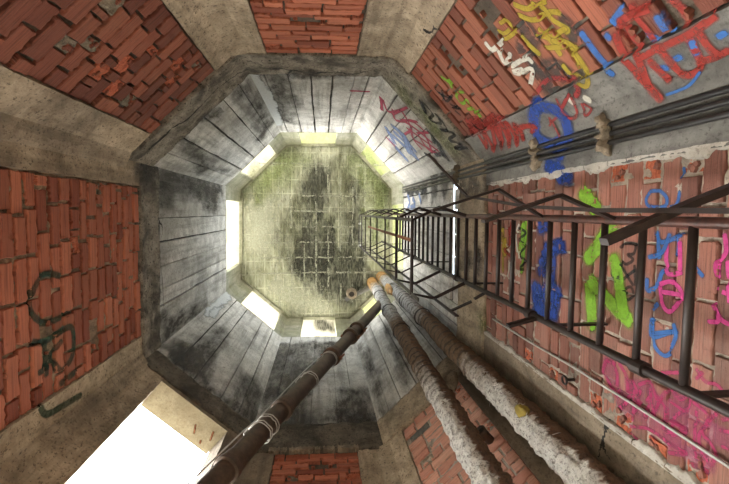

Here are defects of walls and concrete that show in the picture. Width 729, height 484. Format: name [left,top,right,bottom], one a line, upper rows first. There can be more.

spalling [88,54,135,97]
flaking render [490,141,729,187]
water stain [248,154,386,332]
water stain [161,305,225,392]
water stain [223,341,335,423]
water stain [282,350,381,424]
crack [598,419,614,461]